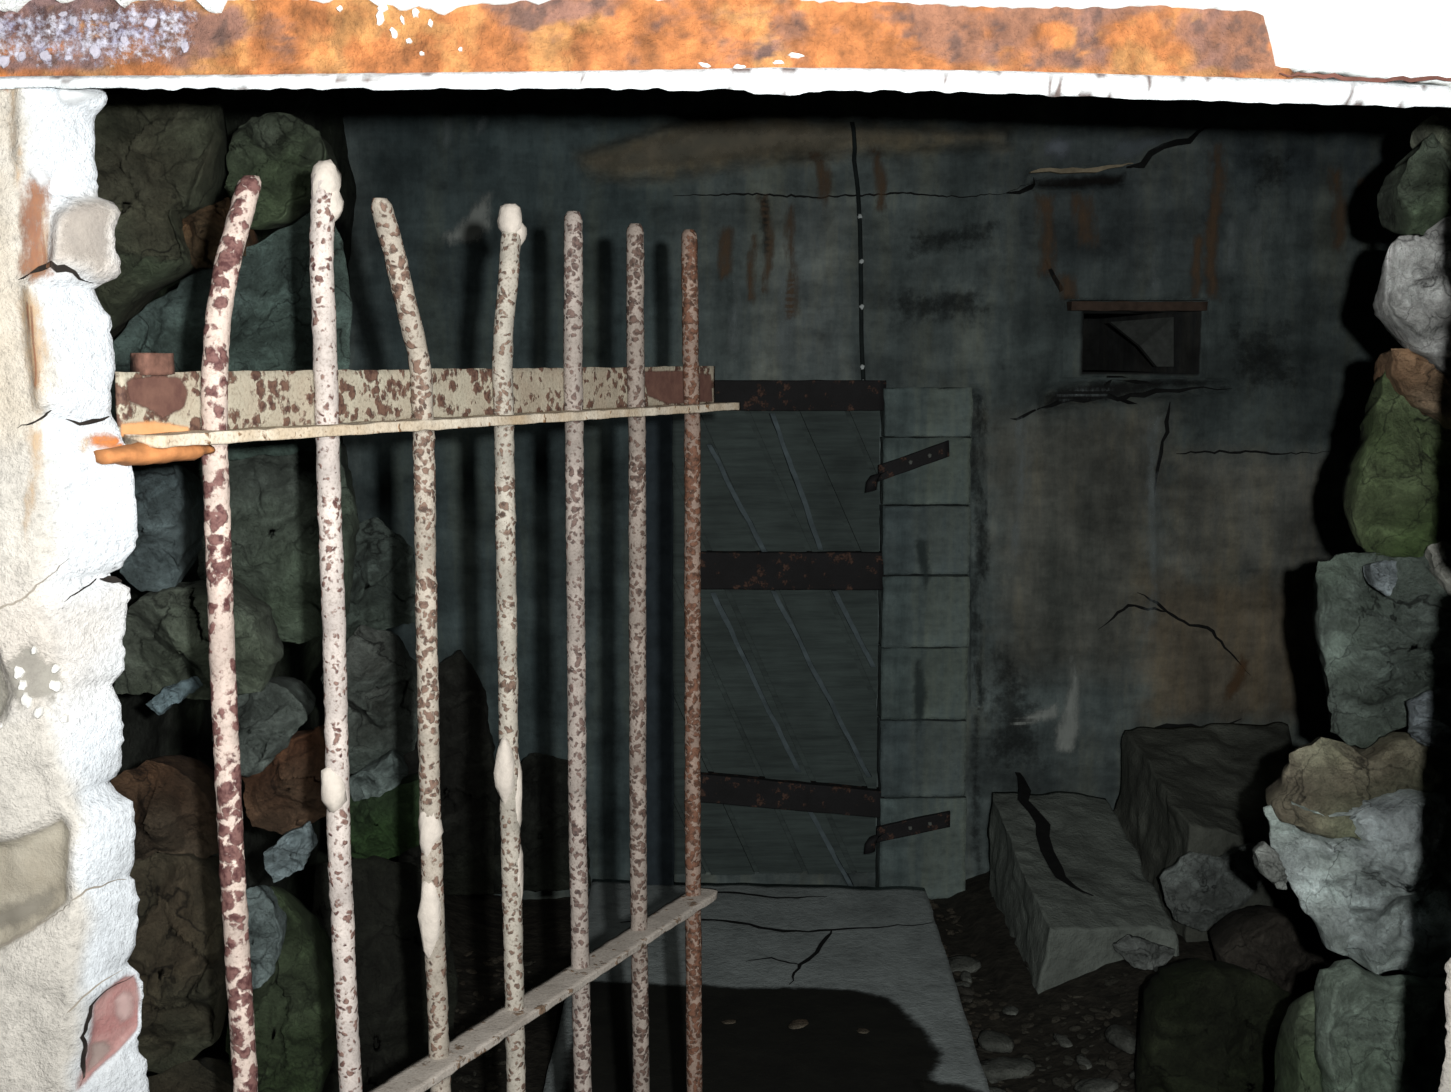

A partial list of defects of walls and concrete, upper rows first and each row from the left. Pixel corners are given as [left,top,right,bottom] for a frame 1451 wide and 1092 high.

crack [1279,73,1451,83]
crack [1126,127,1211,168]
crack [18,261,92,283]
crack [1099,593,1250,675]
spalling [0,646,69,730]
crack [701,891,932,985]
spalling [79,976,139,1087]